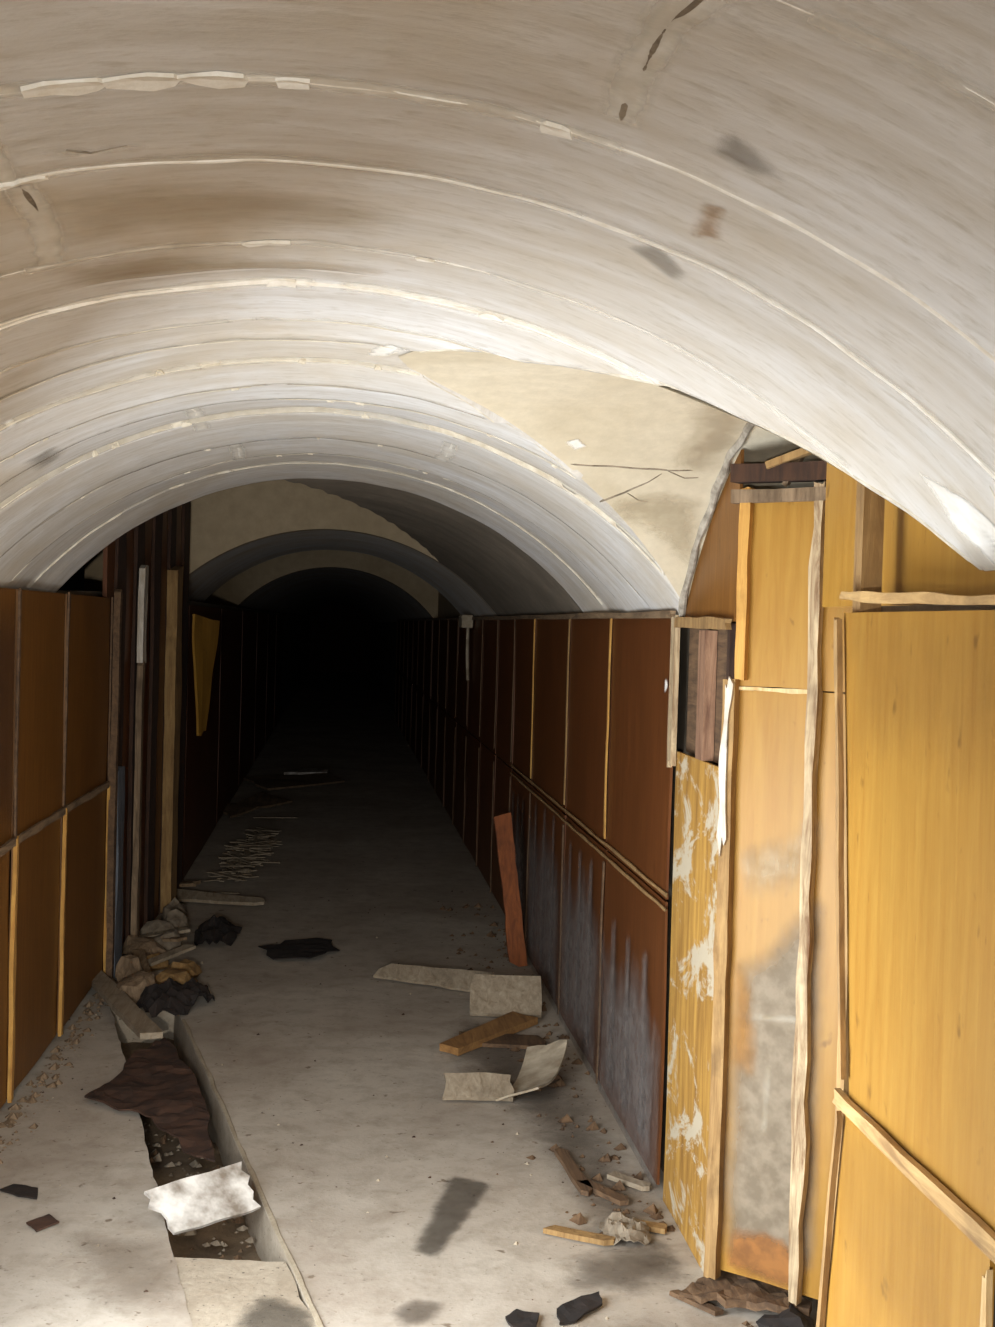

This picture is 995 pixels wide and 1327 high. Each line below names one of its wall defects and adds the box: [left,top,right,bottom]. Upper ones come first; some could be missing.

crack [611,0,721,121]
water stain [515,807,651,1151]
water stain [731,932,814,1255]